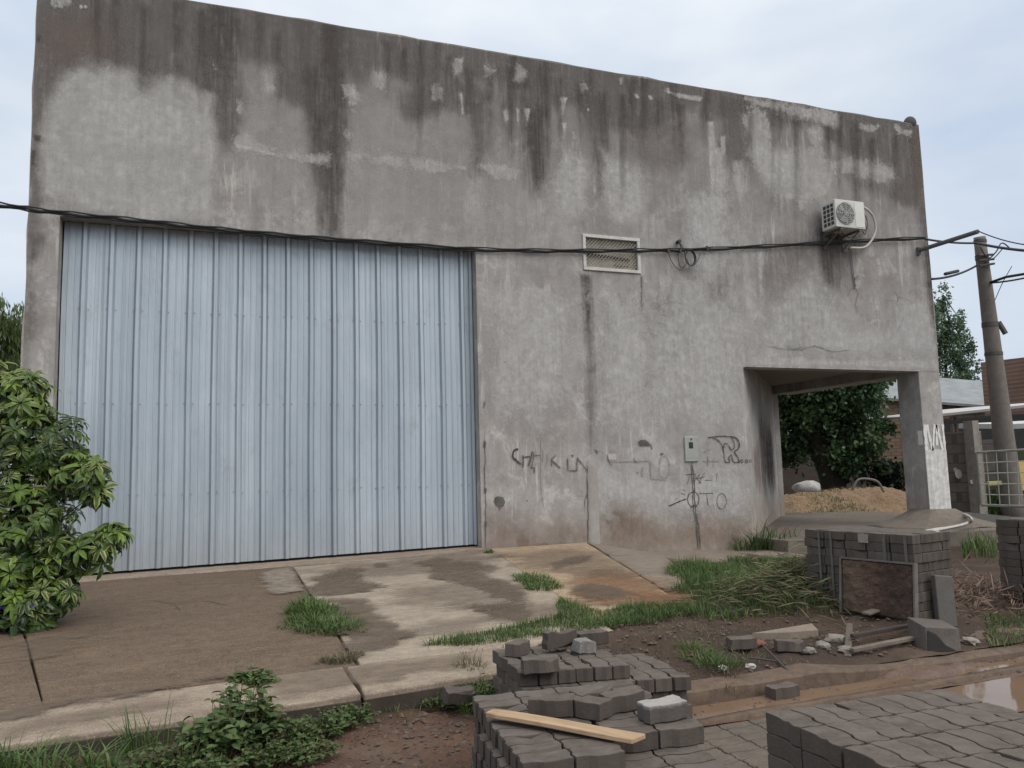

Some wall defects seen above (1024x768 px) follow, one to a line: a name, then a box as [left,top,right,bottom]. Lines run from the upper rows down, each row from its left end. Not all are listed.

leakage [31,0,938,429]
leakage [597,461,744,516]